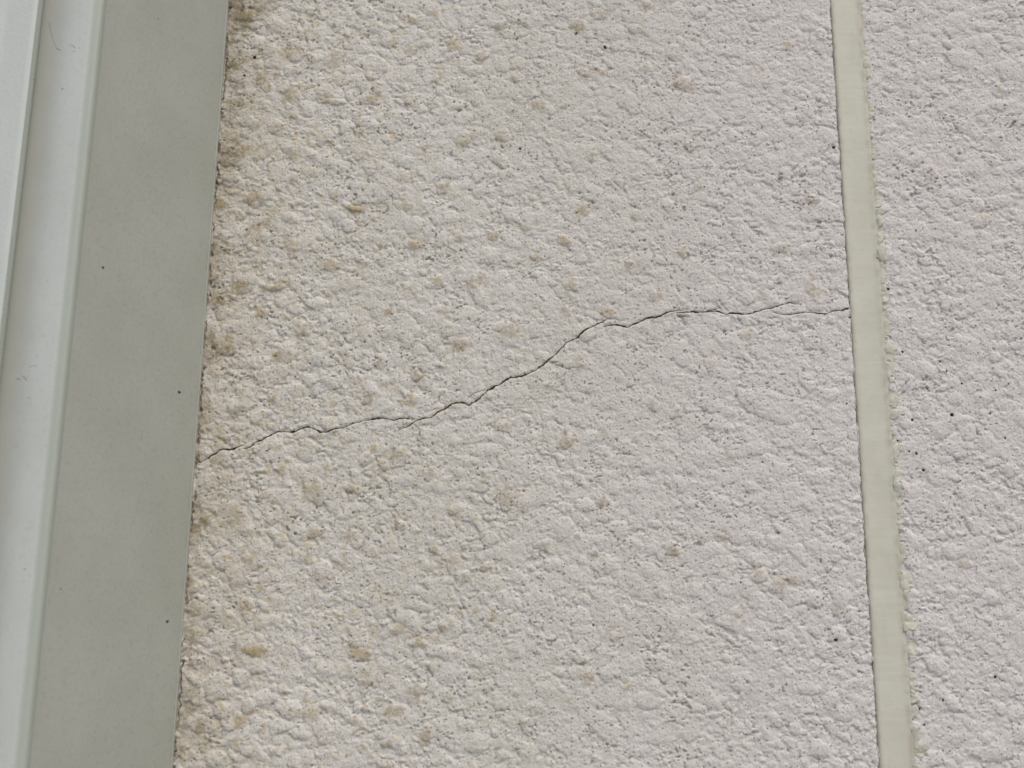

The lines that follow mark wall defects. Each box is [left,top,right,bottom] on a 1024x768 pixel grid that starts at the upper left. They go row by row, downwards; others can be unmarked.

crack [195,302,849,464]